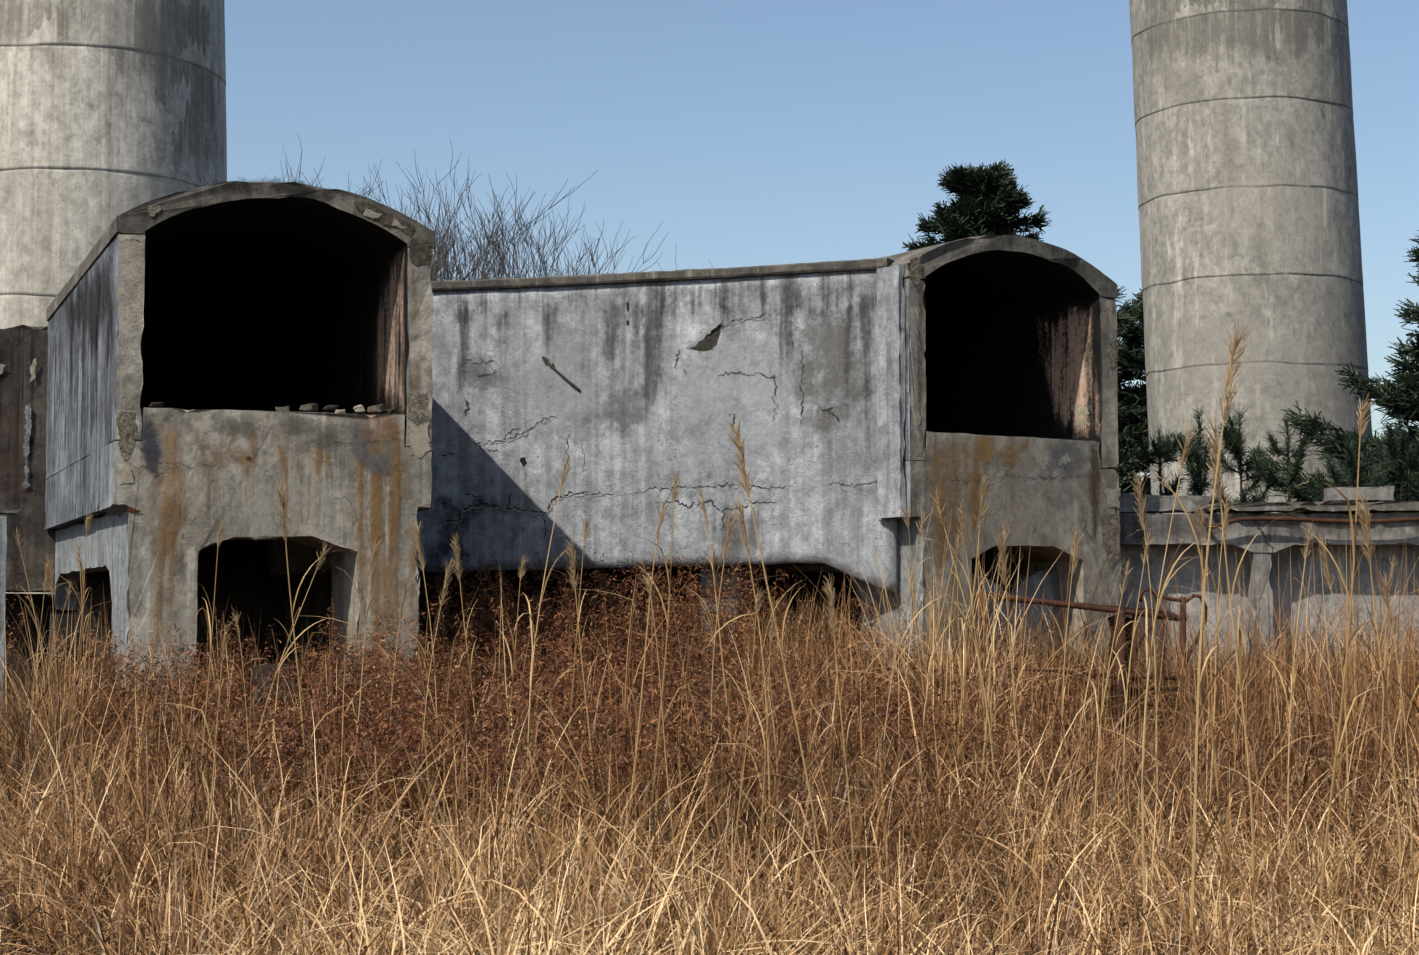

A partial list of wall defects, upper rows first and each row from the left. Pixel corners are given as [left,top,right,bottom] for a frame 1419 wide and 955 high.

leakage [118,0,217,159]
leakage [212,179,330,196]
corrosion [374,262,404,429]
crack [434,359,793,547]
spalling [686,319,721,351]
crack [719,350,840,425]
corrosion [932,436,1014,568]